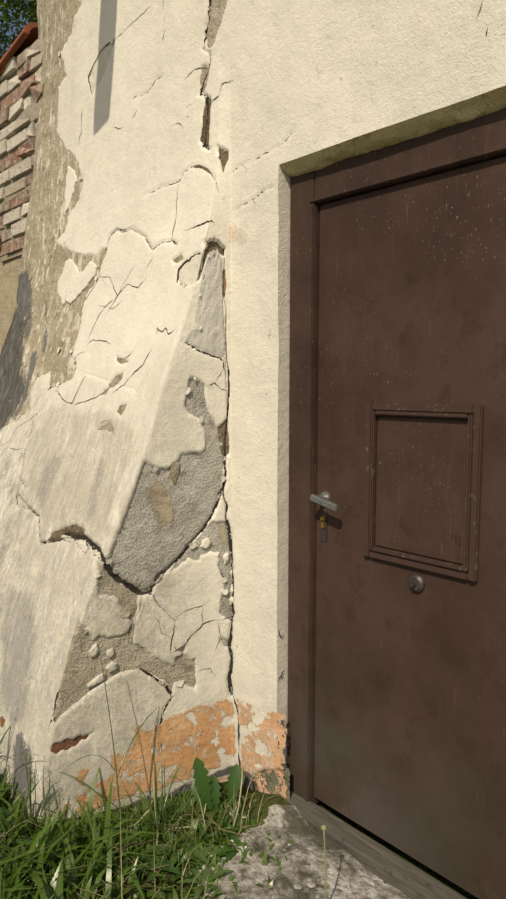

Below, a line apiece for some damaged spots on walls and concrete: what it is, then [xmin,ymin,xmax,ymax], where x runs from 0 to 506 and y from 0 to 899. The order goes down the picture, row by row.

spalling [206,0,228,48]
spalling [200,65,229,172]
flaking render [0,0,107,429]
peeling [173,241,227,359]
spalling [102,357,128,395]
crack [1,0,241,769]
flaking render [48,376,235,728]
spalling [51,735,89,754]
peeling [57,699,290,821]